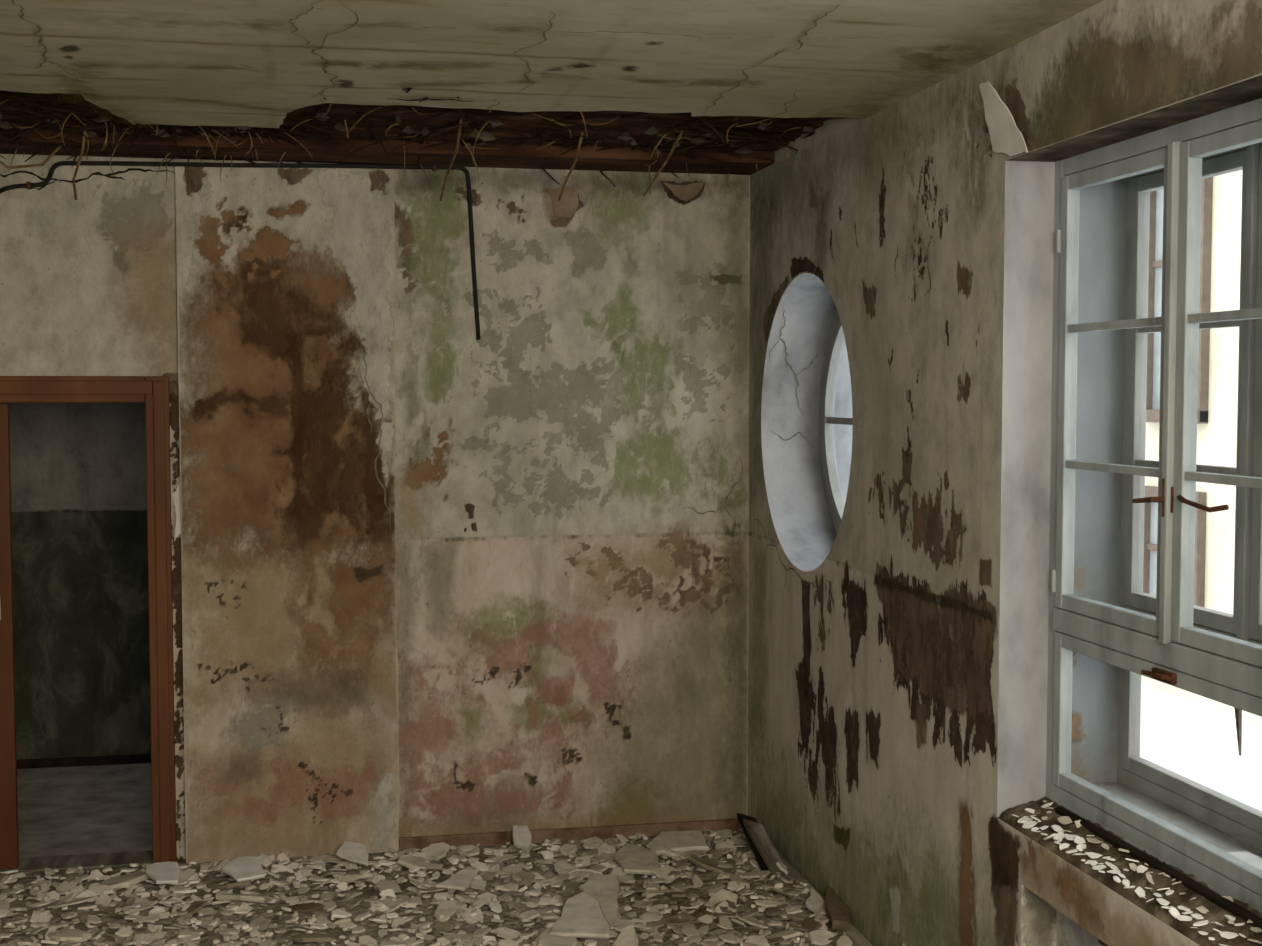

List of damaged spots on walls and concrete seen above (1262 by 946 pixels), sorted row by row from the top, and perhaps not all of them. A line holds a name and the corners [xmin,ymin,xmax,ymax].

crack [11,0,79,91]
crack [289,0,359,104]
crack [397,4,907,115]
flaking render [184,167,210,227]
peeling [278,168,416,478]
spalling [862,280,877,318]
spalling [911,156,949,300]
spalling [957,262,973,298]
flaking render [163,373,186,863]
peeling [796,372,997,851]
flaking render [198,663,267,691]
flaking render [299,762,353,823]